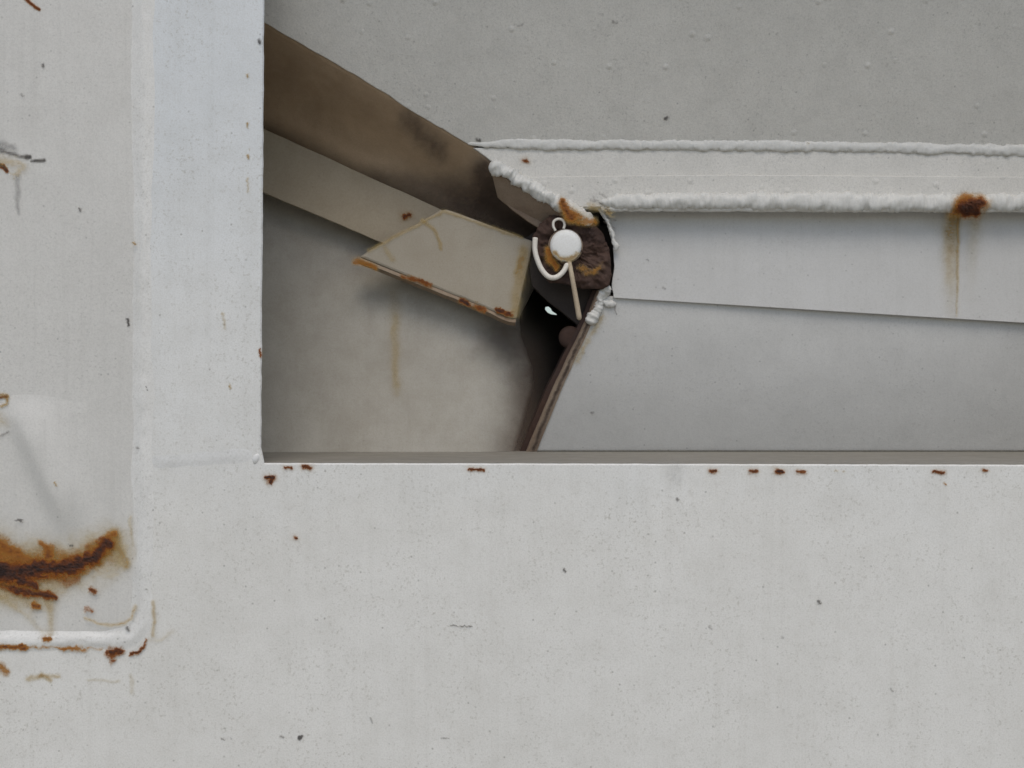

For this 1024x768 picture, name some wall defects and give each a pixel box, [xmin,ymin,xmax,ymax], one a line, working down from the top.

corrosion [559,198,597,225]
corrosion [945,192,989,279]
corrosion [545,247,601,274]
corrosion [459,298,514,317]
corrosion [0,530,135,631]
corrosion [0,636,147,663]